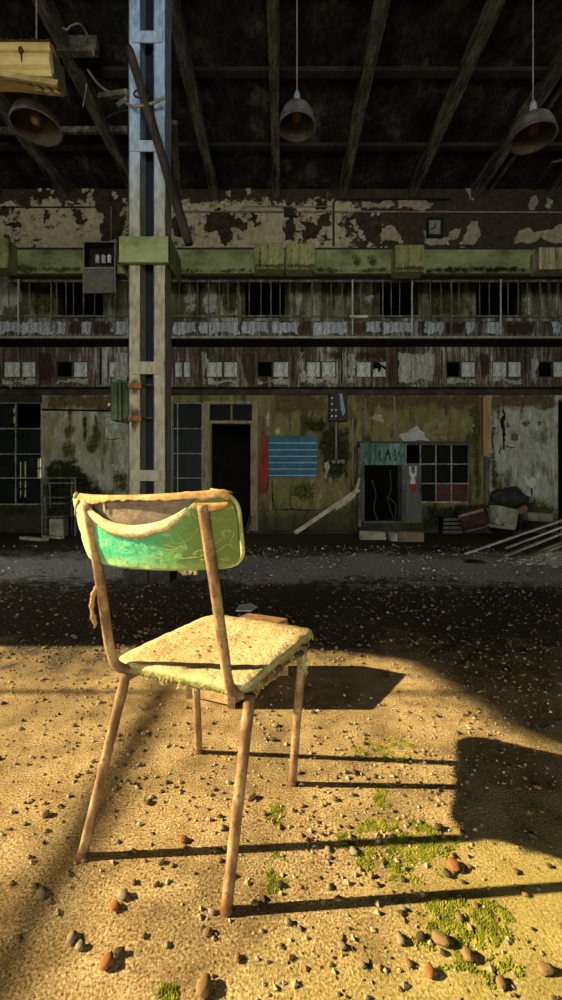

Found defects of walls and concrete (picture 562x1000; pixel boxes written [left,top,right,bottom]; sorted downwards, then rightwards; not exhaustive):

flaking render [0,188,55,231]
flaking render [70,188,127,242]
flaking render [282,198,349,248]
flaking render [350,197,433,248]
flaking render [423,221,481,248]
flaking render [514,224,562,244]
flaking render [528,195,553,211]
leakage [44,395,127,528]
leakage [275,395,351,481]
crack [499,408,515,455]